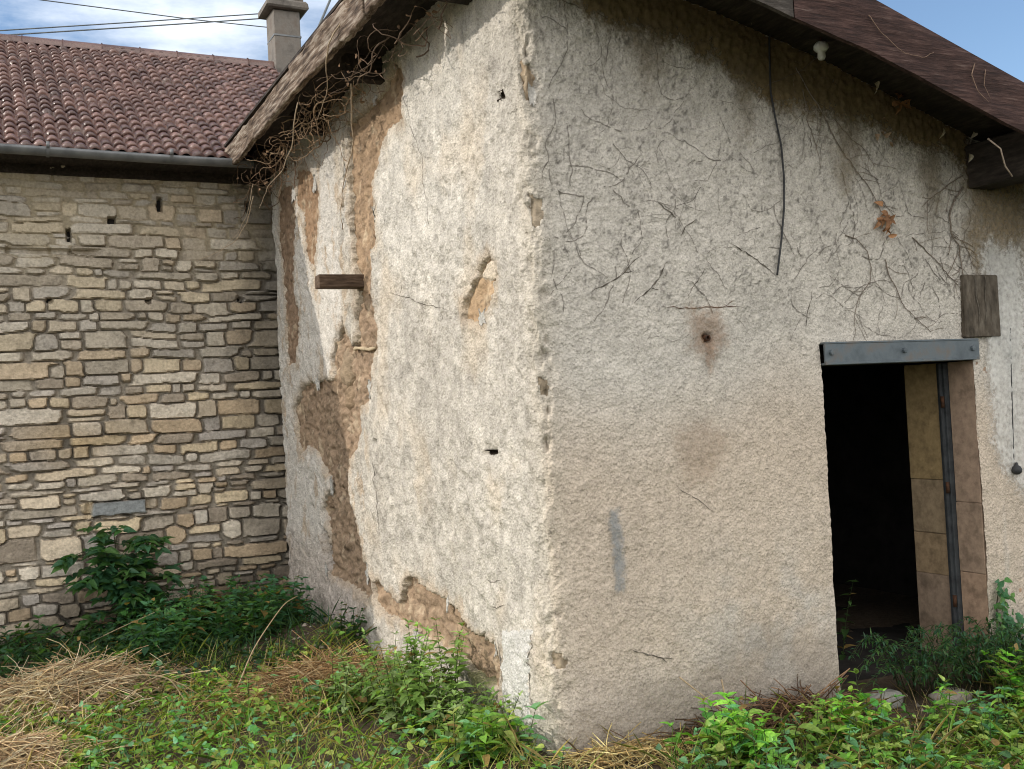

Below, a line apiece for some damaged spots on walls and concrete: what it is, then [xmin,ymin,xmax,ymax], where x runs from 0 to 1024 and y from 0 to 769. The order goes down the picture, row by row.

spalling [520,61,537,106]
flaking render [279,170,319,365]
spalling [528,193,544,228]
flaking render [296,56,501,686]